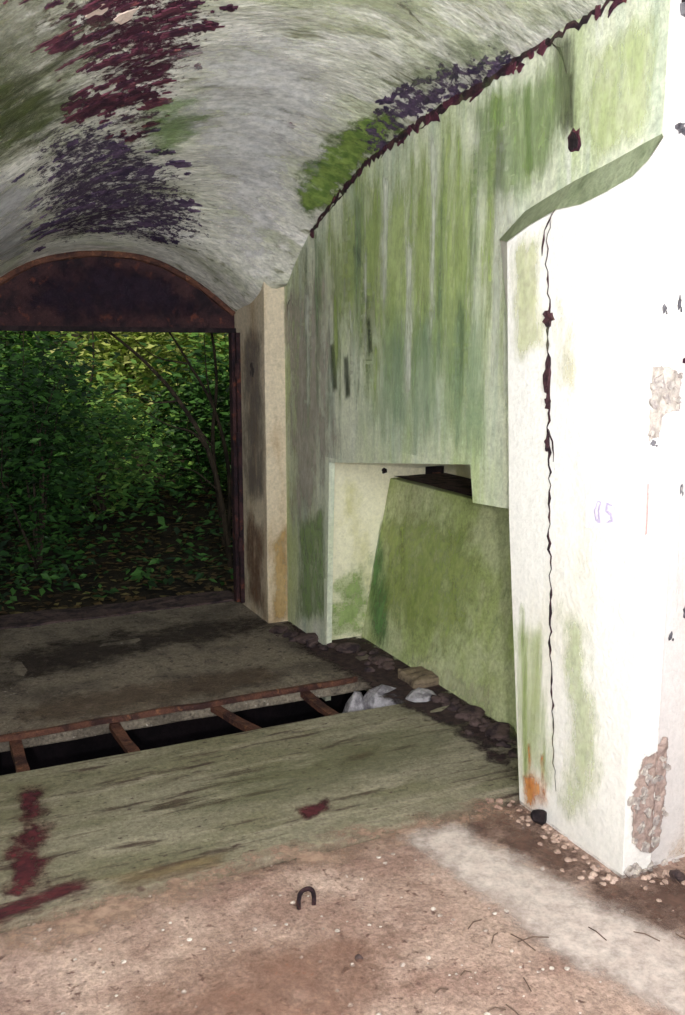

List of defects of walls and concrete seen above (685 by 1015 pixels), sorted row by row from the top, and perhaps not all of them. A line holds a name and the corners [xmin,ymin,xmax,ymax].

peeling [3,0,238,257]
peeling [356,45,514,151]
crack [310,0,627,238]
water stain [555,38,573,130]
water stain [285,180,388,514]
water stain [406,140,443,393]
water stain [461,96,516,402]
spalling [647,358,685,447]
water stain [284,622,515,769]
spalling [623,737,680,879]